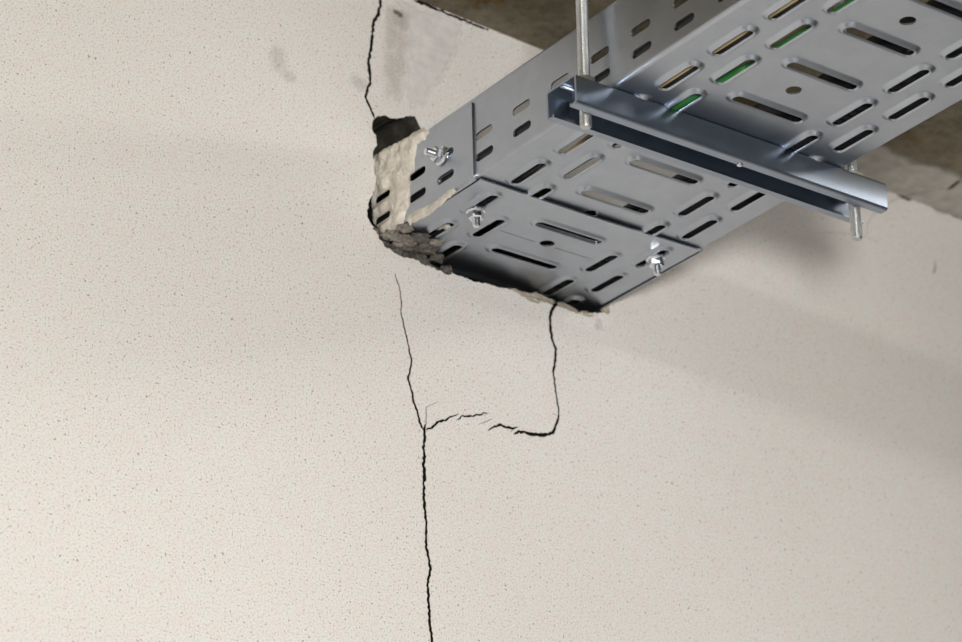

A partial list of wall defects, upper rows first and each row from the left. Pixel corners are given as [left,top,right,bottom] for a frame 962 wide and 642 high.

crack [414,0,489,30]
crack [364,0,382,118]
spalling [372,115,421,156]
spalling [473,220,504,236]
spalling [371,224,488,284]
spalling [492,248,535,262]
spalling [508,288,610,317]
crack [395,275,559,642]